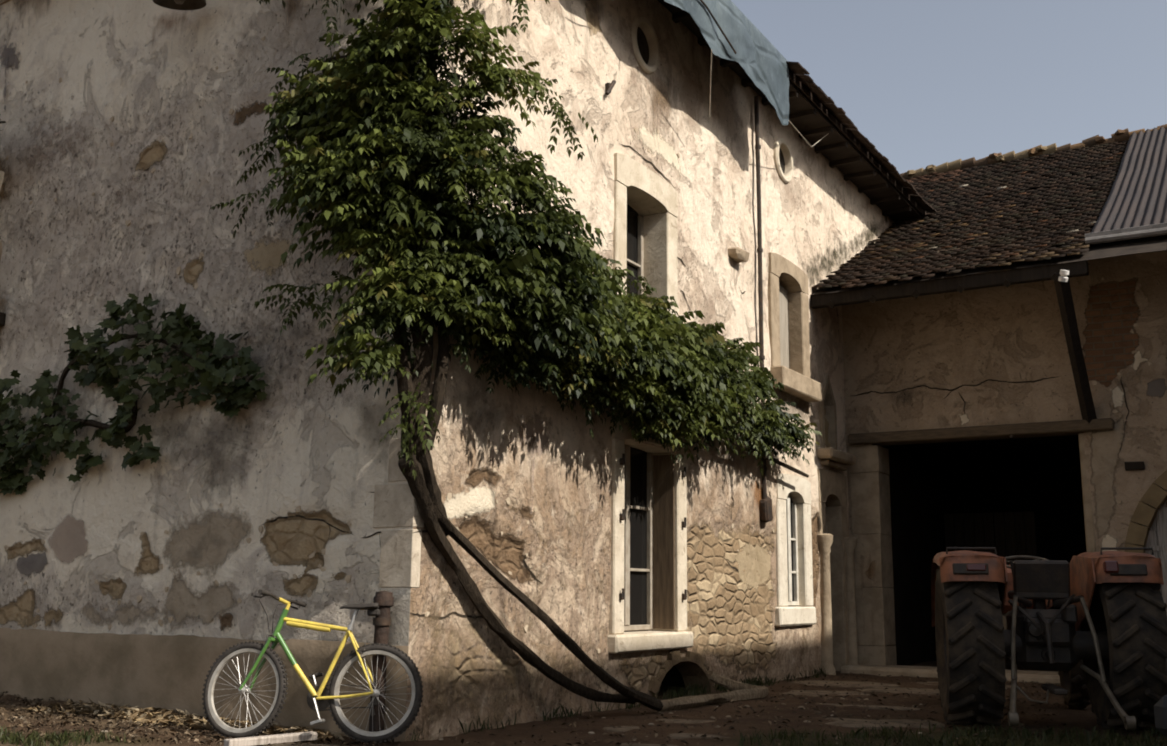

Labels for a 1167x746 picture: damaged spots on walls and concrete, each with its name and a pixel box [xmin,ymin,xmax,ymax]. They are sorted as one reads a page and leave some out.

flaking render [229,101,276,125]
flaking render [130,139,167,180]
flaking render [176,252,204,289]
flaking render [1082,277,1152,413]
crack [853,377,1056,413]
flaking render [4,538,46,559]
flaking render [82,503,352,631]
flaking render [444,466,537,583]
flaking render [1102,534,1118,551]
flaking render [0,581,63,628]